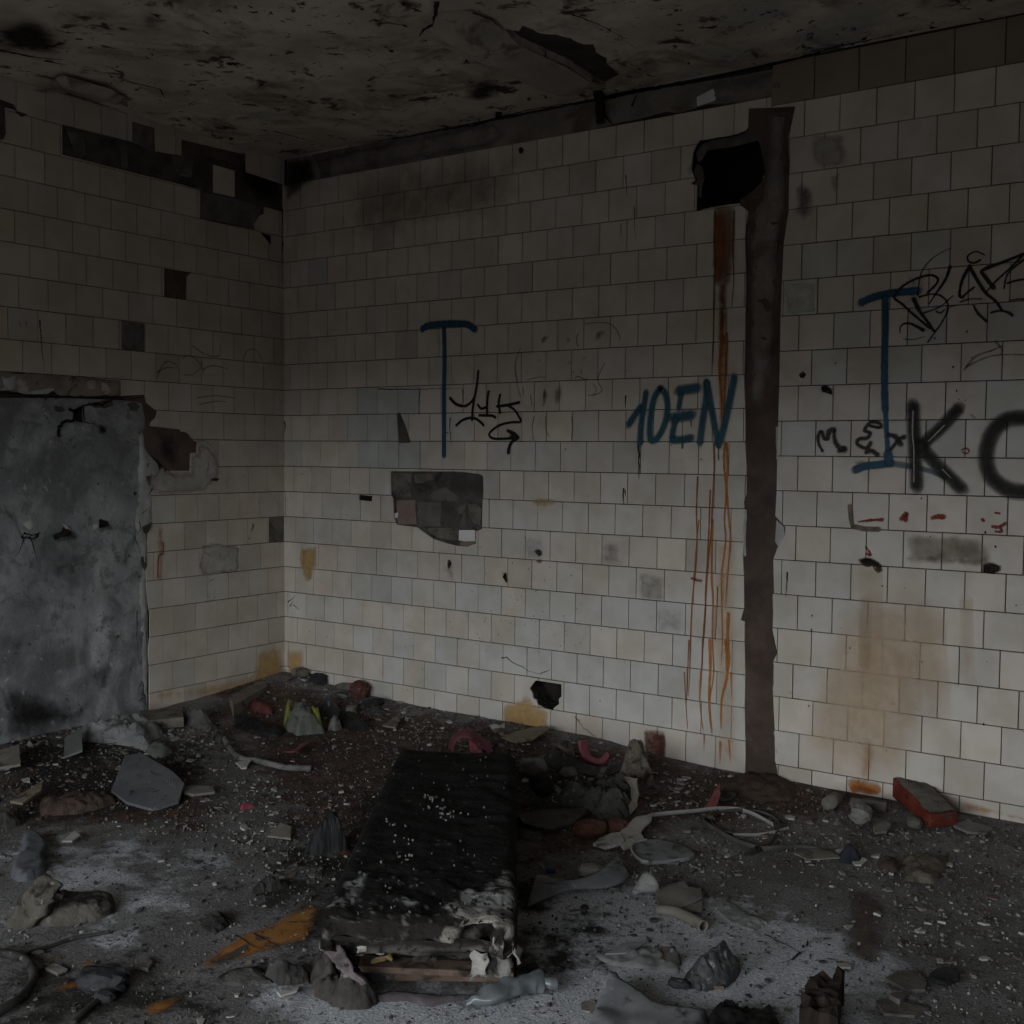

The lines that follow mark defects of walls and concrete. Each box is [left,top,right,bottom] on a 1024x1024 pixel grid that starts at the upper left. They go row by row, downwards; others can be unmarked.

spalling [513,26,620,81]
peeling [61,69,794,244]
peeling [163,264,192,304]
peeling [121,321,145,352]
corrosion [713,209,735,417]
peeling [0,372,197,482]
spalling [53,524,76,540]
spalling [93,519,109,530]
peeling [392,471,484,548]
damp [302,549,315,579]
corrosion [684,443,732,742]
spalling [532,681,561,710]